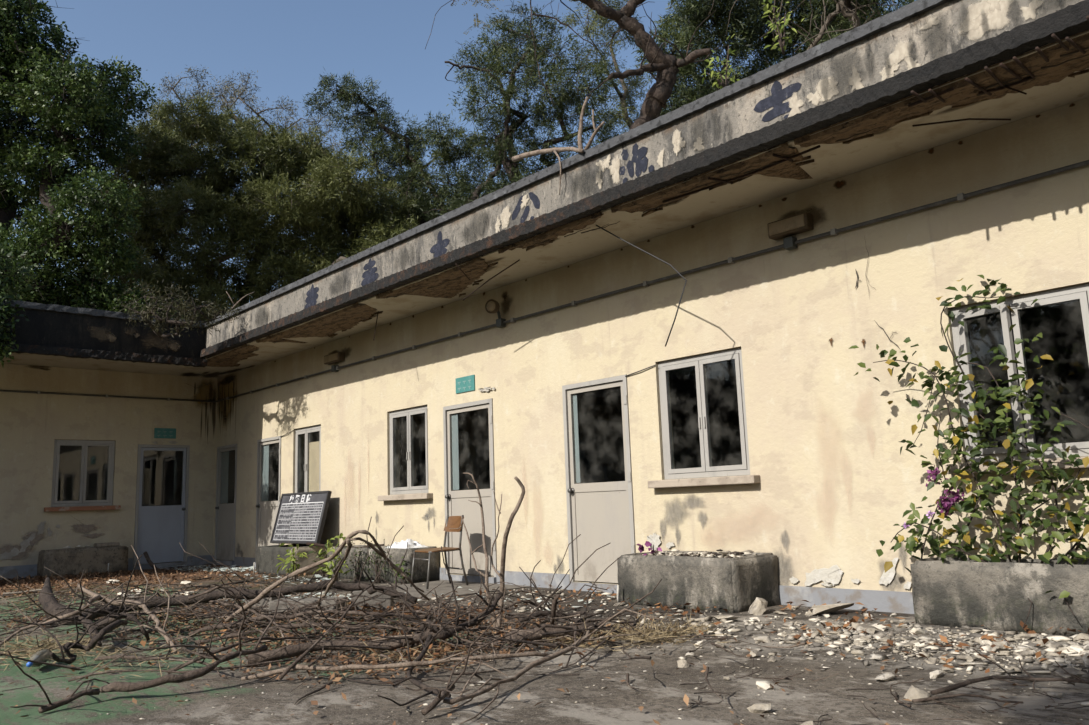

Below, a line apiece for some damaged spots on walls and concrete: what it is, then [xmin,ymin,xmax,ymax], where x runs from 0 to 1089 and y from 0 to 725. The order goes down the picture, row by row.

peeling [960,0,1043,40]
spalling [256,15,1089,343]
leakage [182,365,254,442]
leakage [661,498,706,541]